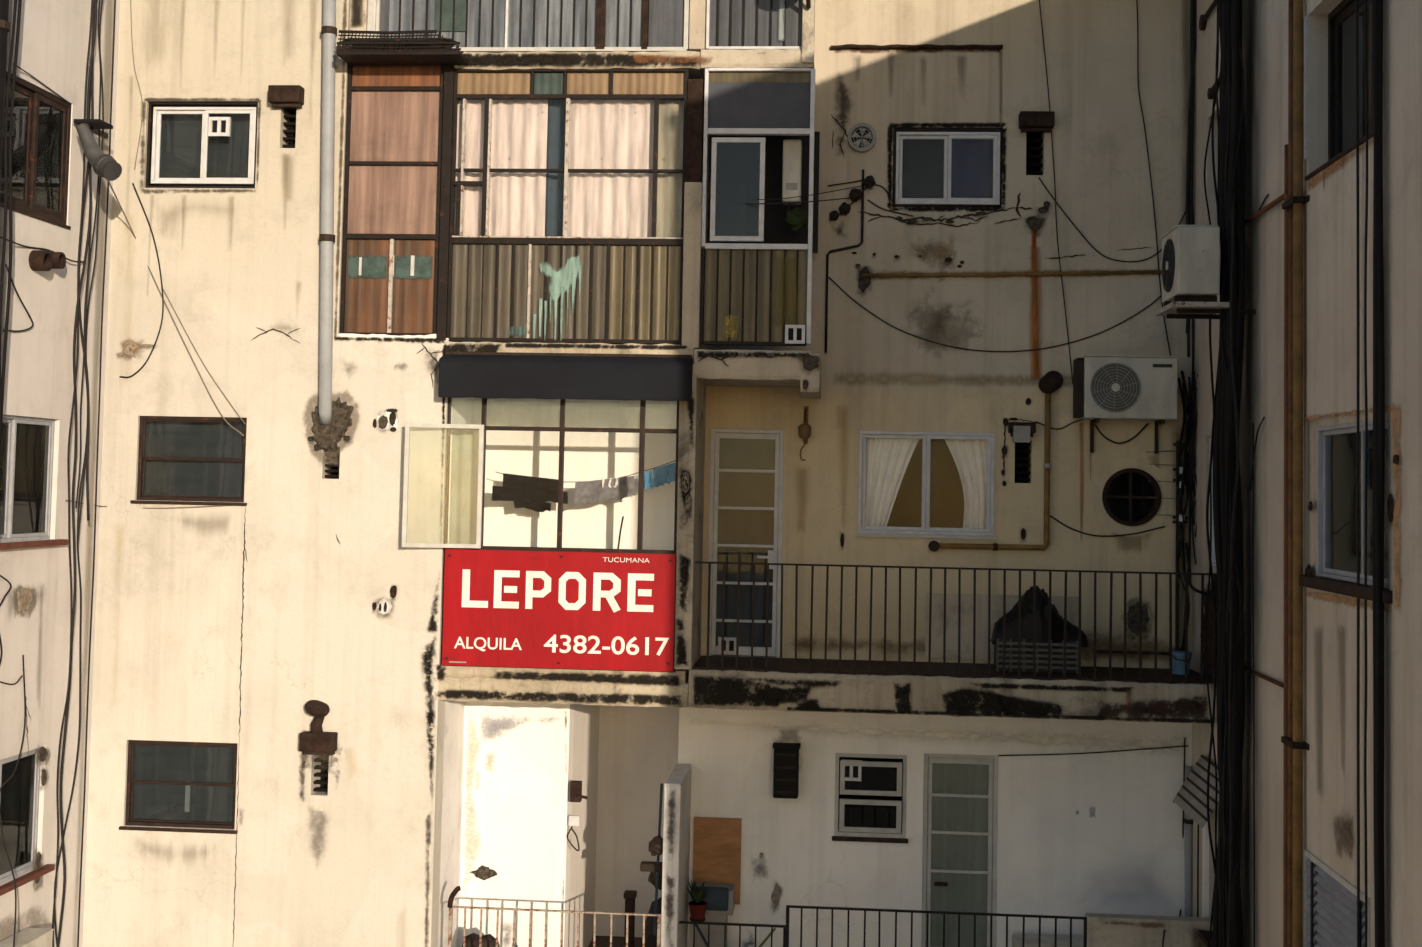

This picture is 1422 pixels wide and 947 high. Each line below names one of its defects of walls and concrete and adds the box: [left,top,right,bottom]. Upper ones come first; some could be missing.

crack [252,327,300,342]
spalling [306,394,398,463]